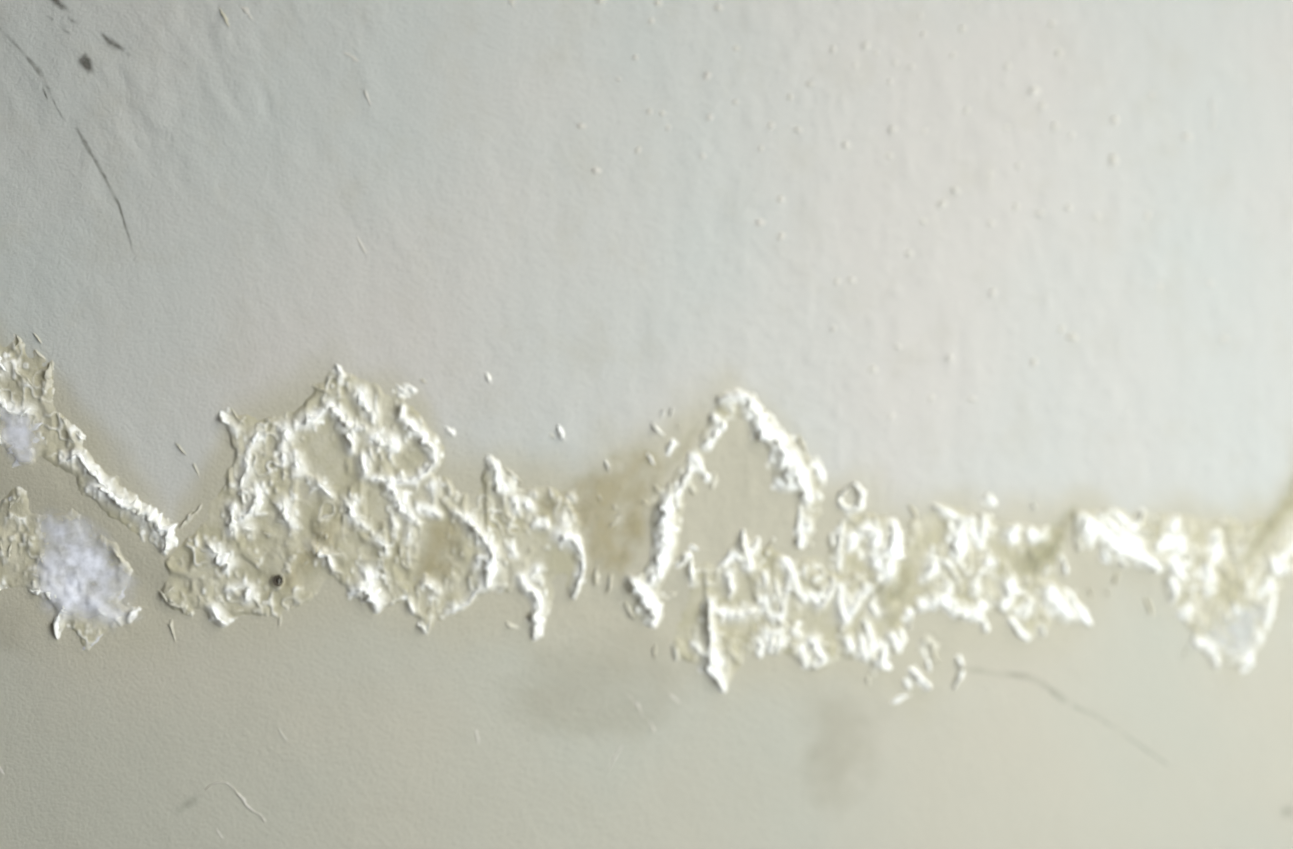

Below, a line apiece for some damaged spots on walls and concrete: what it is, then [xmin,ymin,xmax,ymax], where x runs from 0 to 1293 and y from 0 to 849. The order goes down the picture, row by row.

flaking render [0,333,1293,704]